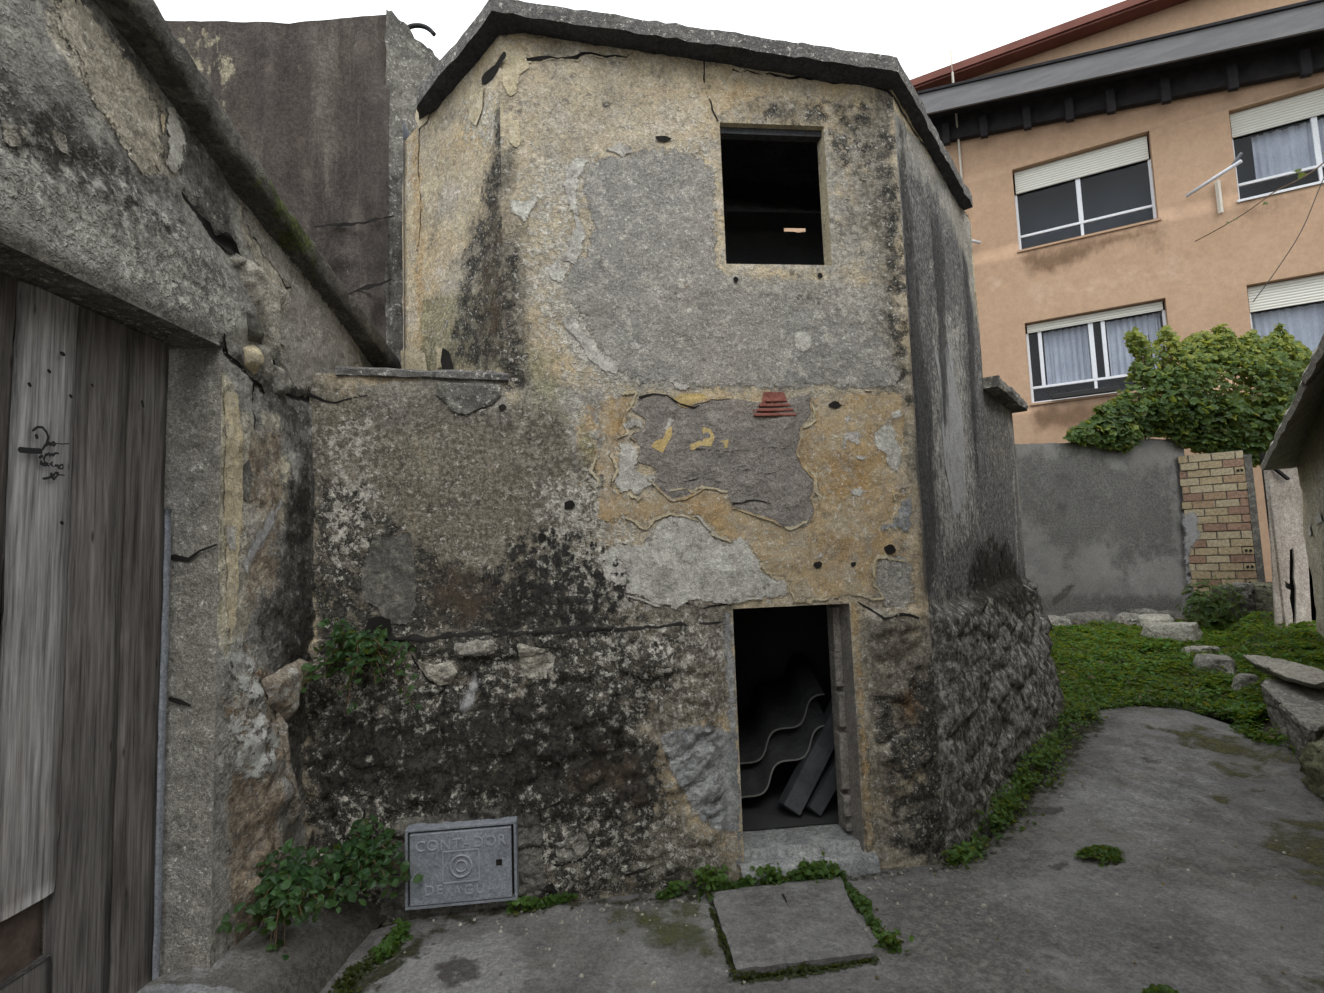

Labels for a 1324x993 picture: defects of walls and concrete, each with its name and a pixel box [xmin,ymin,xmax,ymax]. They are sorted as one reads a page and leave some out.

flaking render [502,48,530,96]
crack [481,52,630,85]
flaking render [509,194,538,224]
crack [181,192,367,428]
flaking render [549,143,913,610]
leakage [901,166,978,600]
leakage [441,526,644,634]
leakage [969,537,1073,618]
crack [387,602,728,687]
leakage [303,653,674,850]